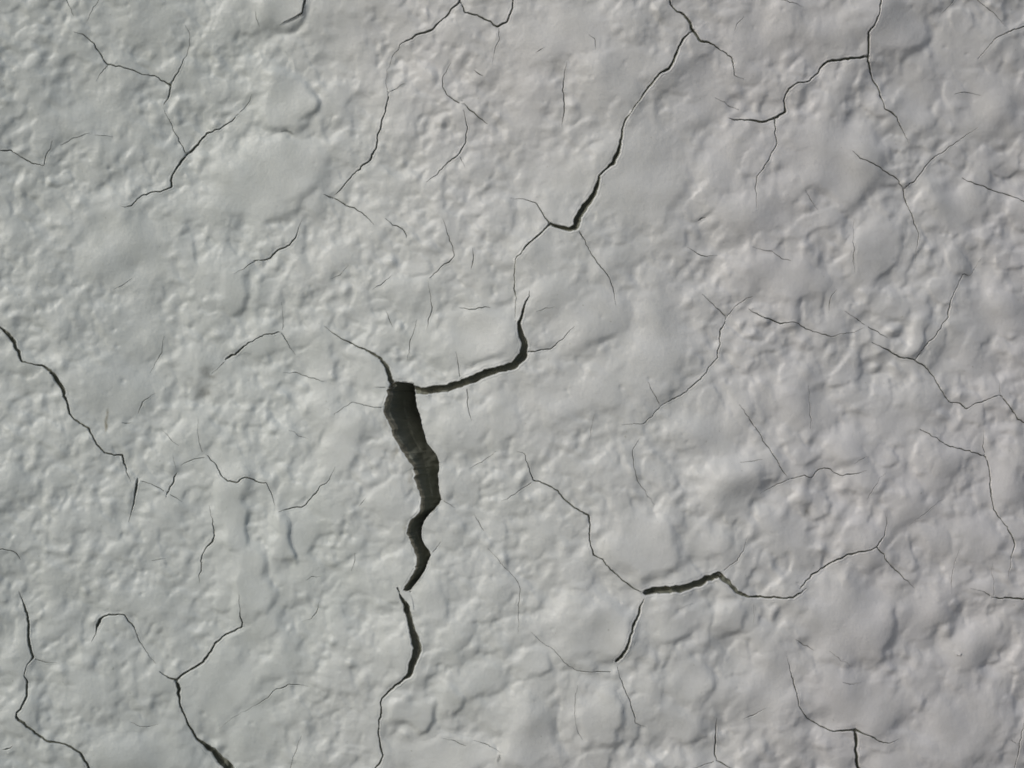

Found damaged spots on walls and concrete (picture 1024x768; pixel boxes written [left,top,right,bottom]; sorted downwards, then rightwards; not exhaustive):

crack [277,0,309,28]
crack [0,131,115,169]
crack [71,23,254,209]
crack [231,218,304,277]
crack [0,324,338,586]
crack [209,300,327,384]
crack [321,0,1024,768]
crack [0,589,92,768]
crack [89,592,313,768]
crack [300,574,324,624]